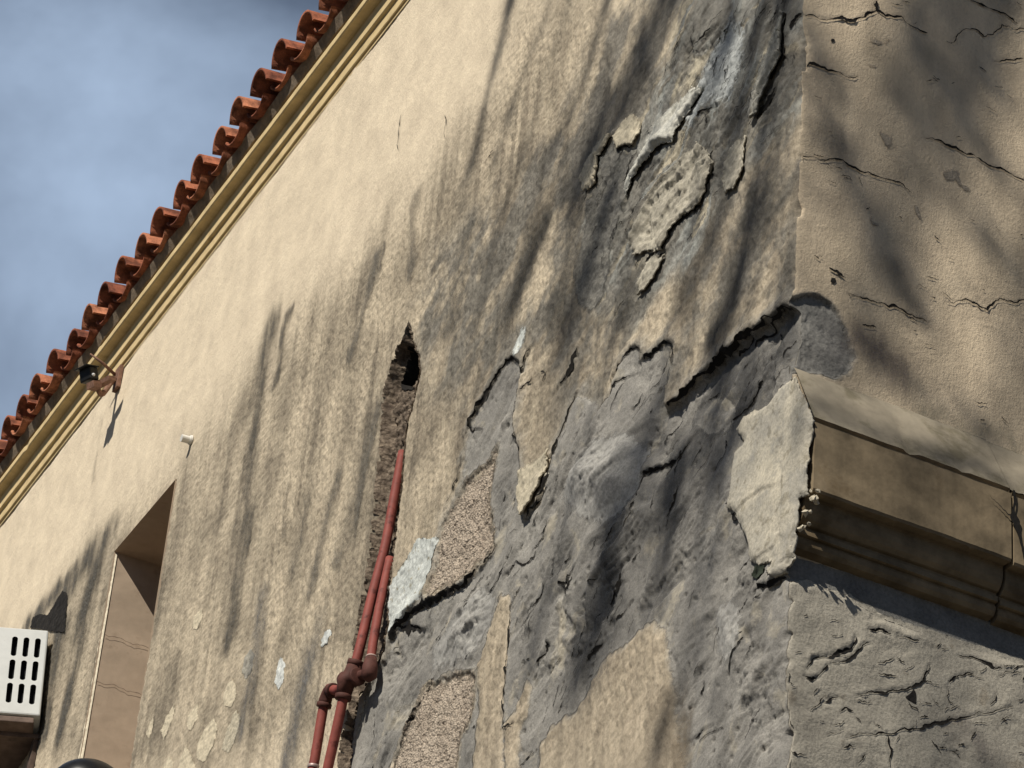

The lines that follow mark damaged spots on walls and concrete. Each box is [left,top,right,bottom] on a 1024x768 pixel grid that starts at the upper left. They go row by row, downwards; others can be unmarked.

peeling [573,86,747,311]
peeling [749,10,785,119]
crack [584,0,1024,316]
crack [814,235,1024,346]
spalling [351,293,1024,768]
crack [788,614,1024,768]